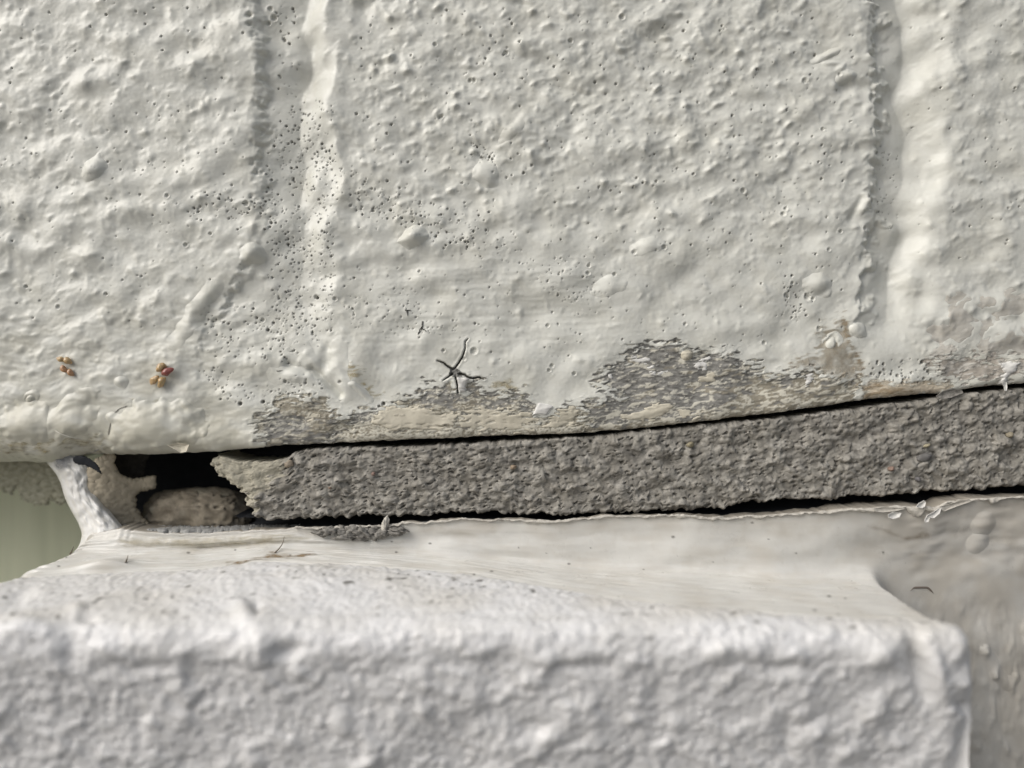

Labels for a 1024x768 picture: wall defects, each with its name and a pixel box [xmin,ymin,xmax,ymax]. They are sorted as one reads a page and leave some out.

peeling [251,288,1024,447]
crack [726,393,927,419]
crack [962,382,1024,390]
crack [240,430,609,457]
spalling [47,442,247,549]
crack [235,485,1024,528]